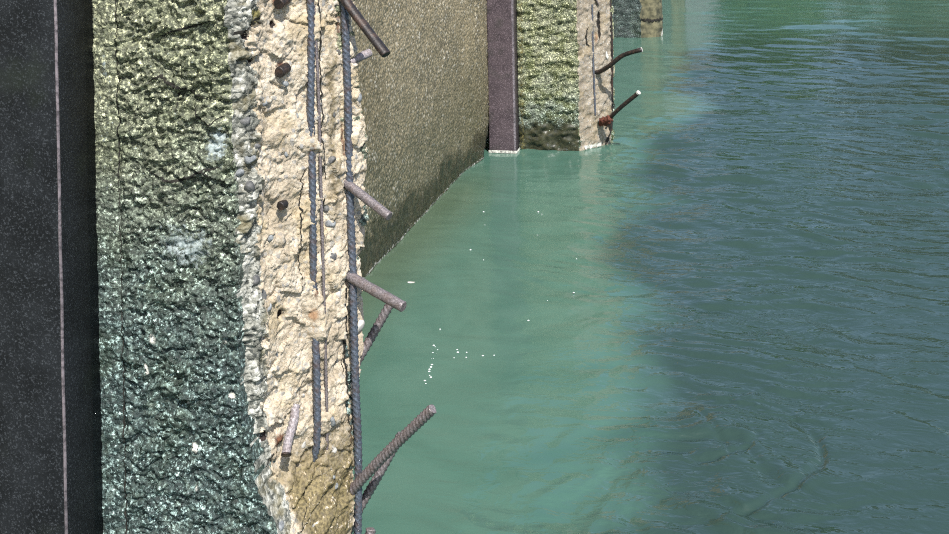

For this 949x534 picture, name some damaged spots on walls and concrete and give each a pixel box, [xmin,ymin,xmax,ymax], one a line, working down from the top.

spalling [576,0,615,151]
corrosion [599,115,614,127]
spalling [223,0,368,534]